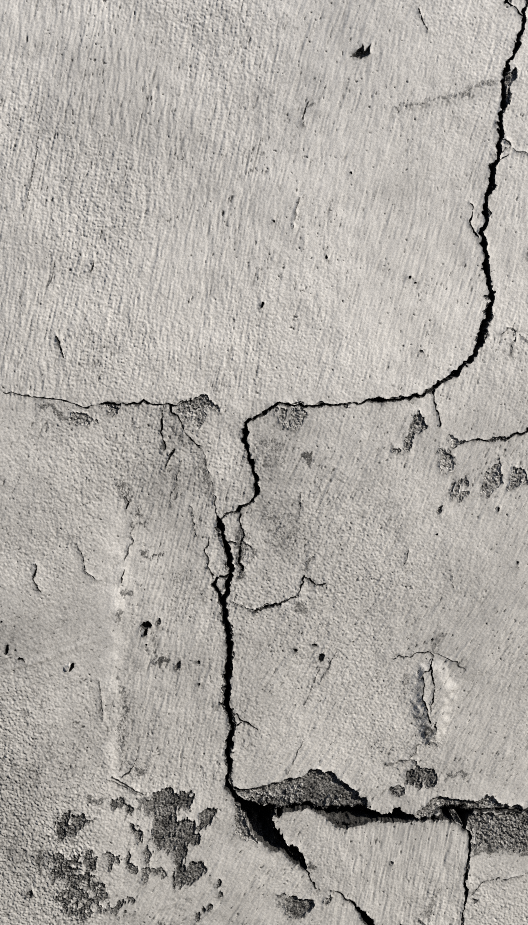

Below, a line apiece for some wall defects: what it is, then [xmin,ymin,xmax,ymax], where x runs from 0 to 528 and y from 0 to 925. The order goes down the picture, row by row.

crack [3,391,94,409]
crack [99,0,528,813]
crack [76,543,102,581]
peeling [241,769,371,808]
peeling [389,765,528,853]
peeling [48,785,218,921]
peeling [195,879,223,922]
crack [306,870,351,901]
crack [418,805,528,925]